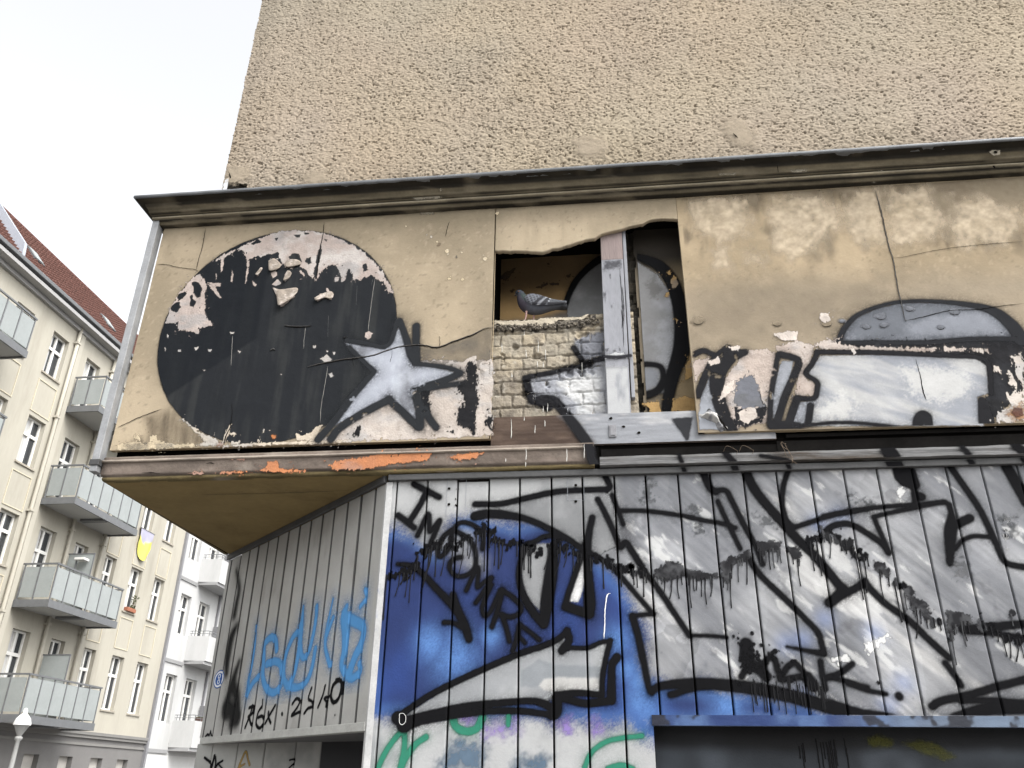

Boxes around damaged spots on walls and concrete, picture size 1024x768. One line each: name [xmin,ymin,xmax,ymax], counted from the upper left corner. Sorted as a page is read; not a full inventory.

peeling [165,226,394,352]
peeling [117,355,496,477]
crack [308,327,490,367]
flaking render [659,270,678,298]
peeling [642,330,1024,431]
crack [875,190,1024,321]